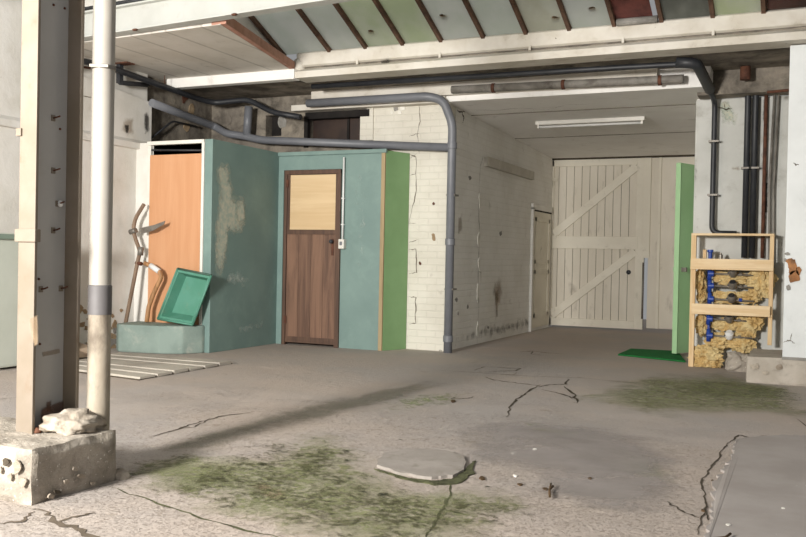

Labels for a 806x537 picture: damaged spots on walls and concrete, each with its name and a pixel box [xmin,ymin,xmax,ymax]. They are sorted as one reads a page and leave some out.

peeling [216,166,245,269]
peeling [111,309,123,349]
crack [428,351,634,414]
corrosion [41,401,64,417]
crack [155,411,254,436]
spalling [0,458,27,488]
crack [667,435,765,535]
crack [0,508,99,537]
crack [113,487,278,537]